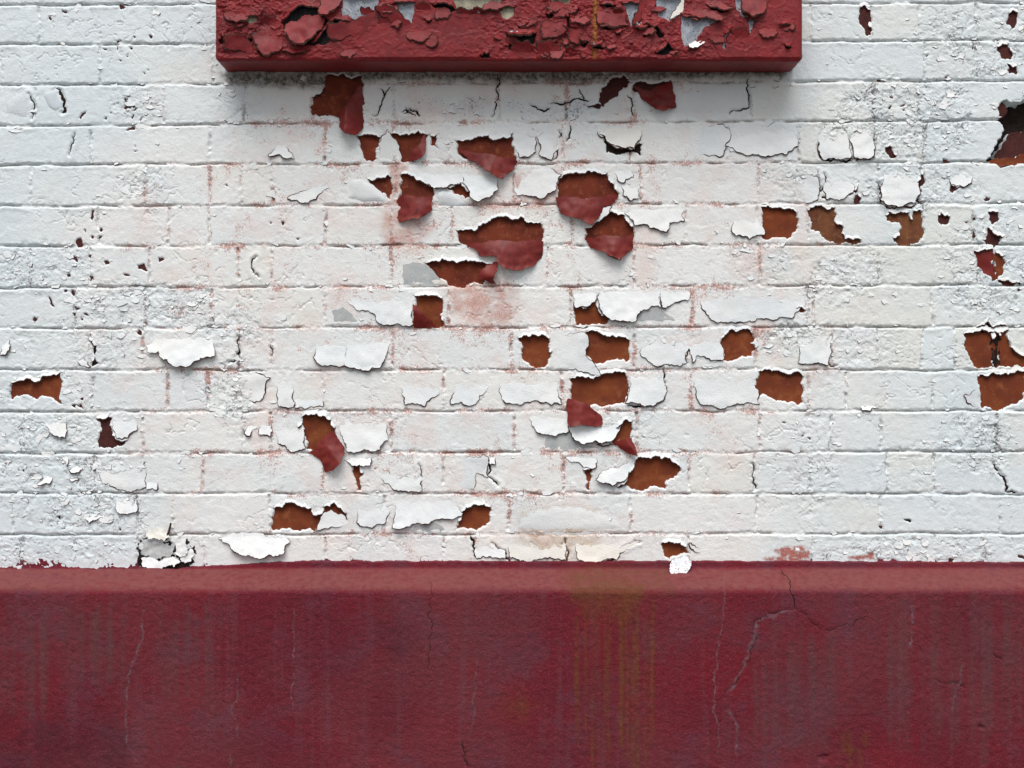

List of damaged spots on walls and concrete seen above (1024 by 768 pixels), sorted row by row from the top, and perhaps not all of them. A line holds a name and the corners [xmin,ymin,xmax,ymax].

peeling [220,0,796,60]
peeling [105,70,164,131]
peeling [310,1,1024,498]
peeling [0,207,643,569]
peeling [661,529,713,574]
peeling [873,526,935,562]
crack [713,570,870,720]